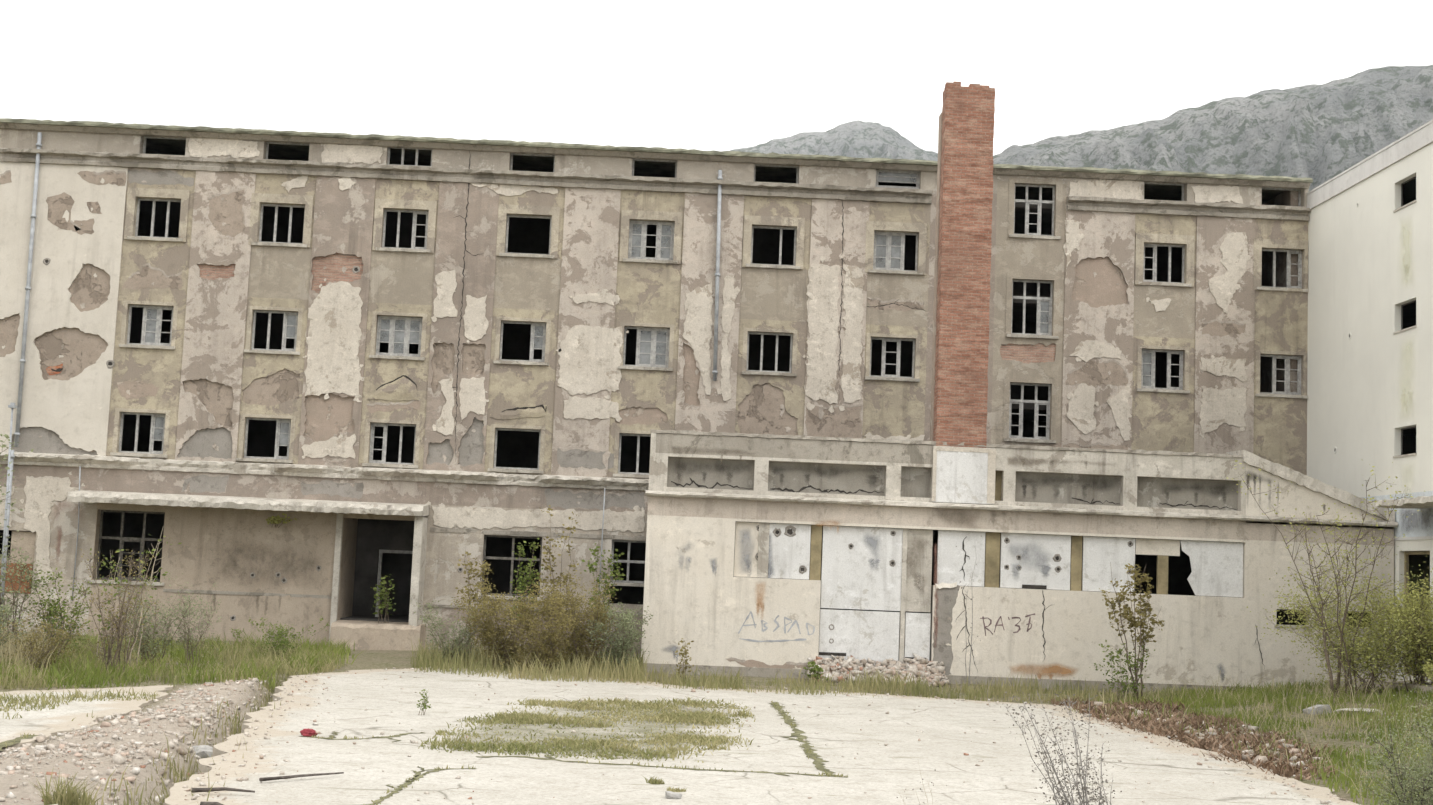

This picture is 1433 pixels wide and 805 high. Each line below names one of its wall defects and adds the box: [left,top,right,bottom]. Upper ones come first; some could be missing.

flaking render [0,314,20,357]
flaking render [34,264,115,381]